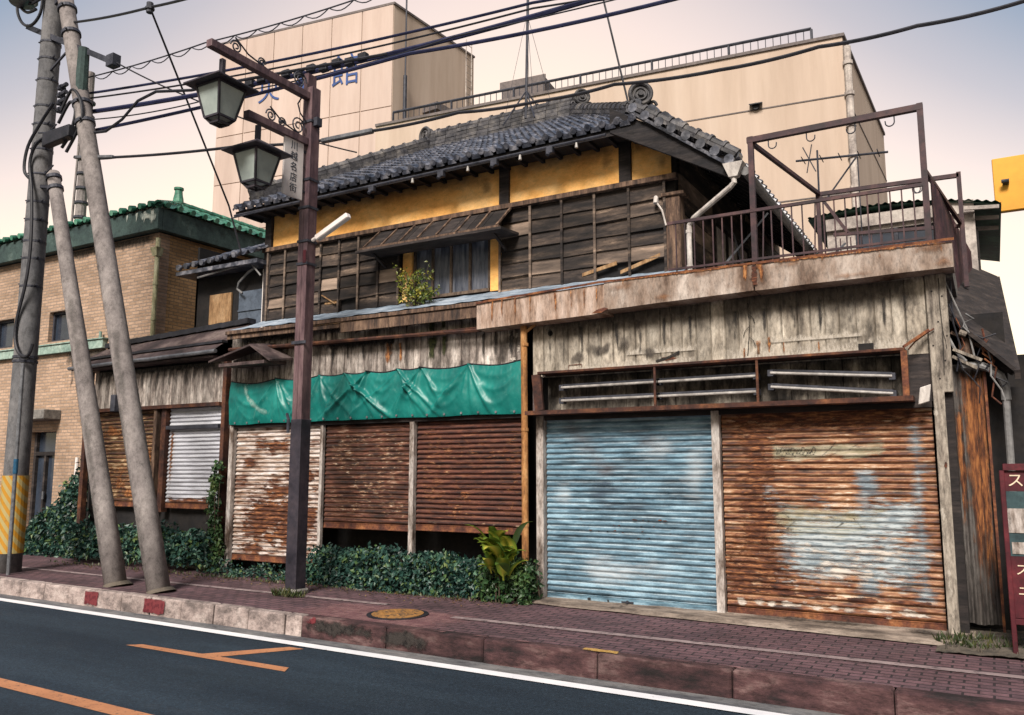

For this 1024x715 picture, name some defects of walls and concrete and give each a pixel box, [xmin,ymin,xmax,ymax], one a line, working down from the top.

corrosion [743,264,763,285]
corrosion [778,242,946,264]
corrosion [232,438,290,558]
corrosion [307,470,319,553]
corrosion [423,429,521,519]
corrosion [713,408,932,605]
peeling [737,466,933,619]
corrosion [956,373,996,572]